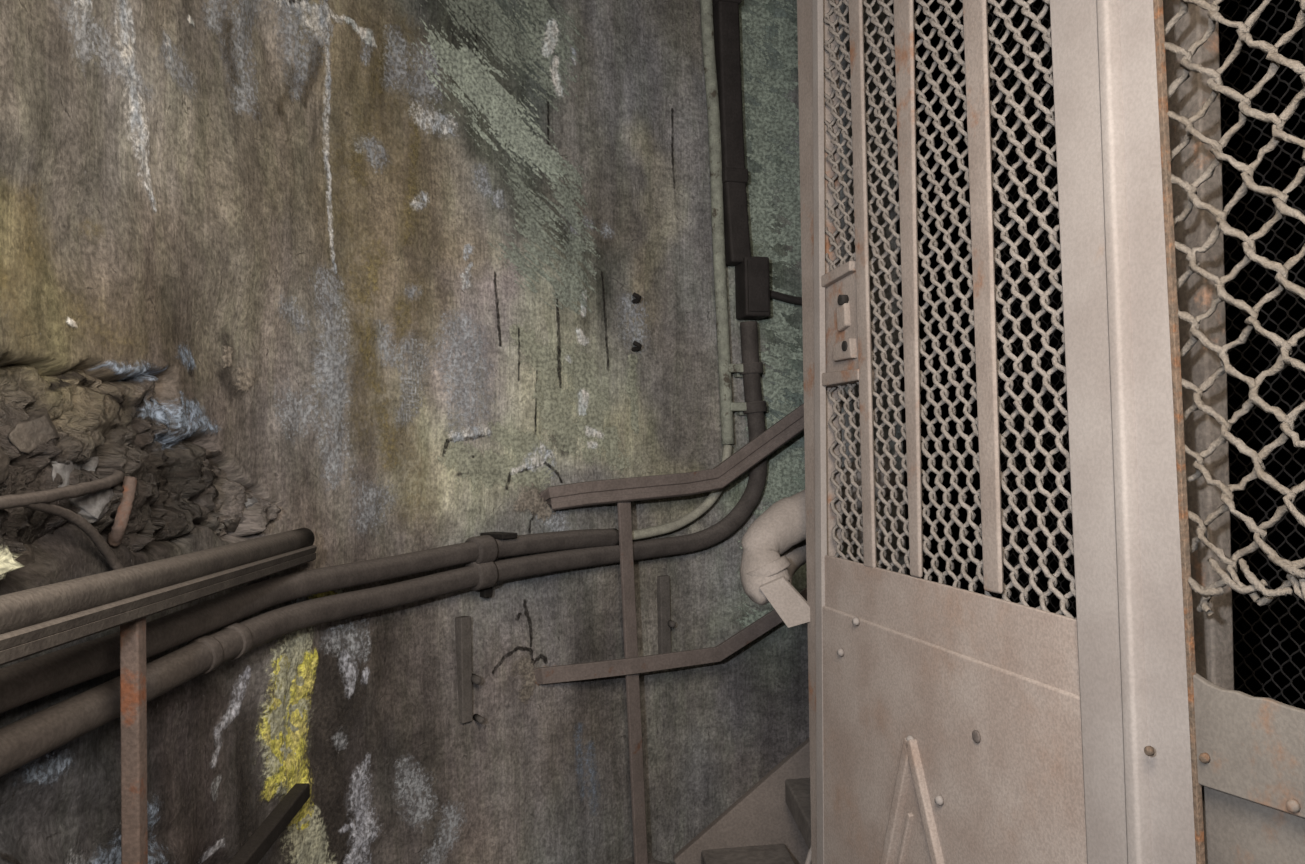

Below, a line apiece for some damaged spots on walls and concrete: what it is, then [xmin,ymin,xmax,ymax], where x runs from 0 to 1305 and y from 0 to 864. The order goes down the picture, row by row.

water stain [68,0,157,212]
crack [206,0,376,113]
water stain [385,31,456,135]
water stain [542,19,576,97]
water stain [461,244,473,290]
water stain [576,292,589,345]
water stain [578,390,602,448]
crack [492,599,548,703]